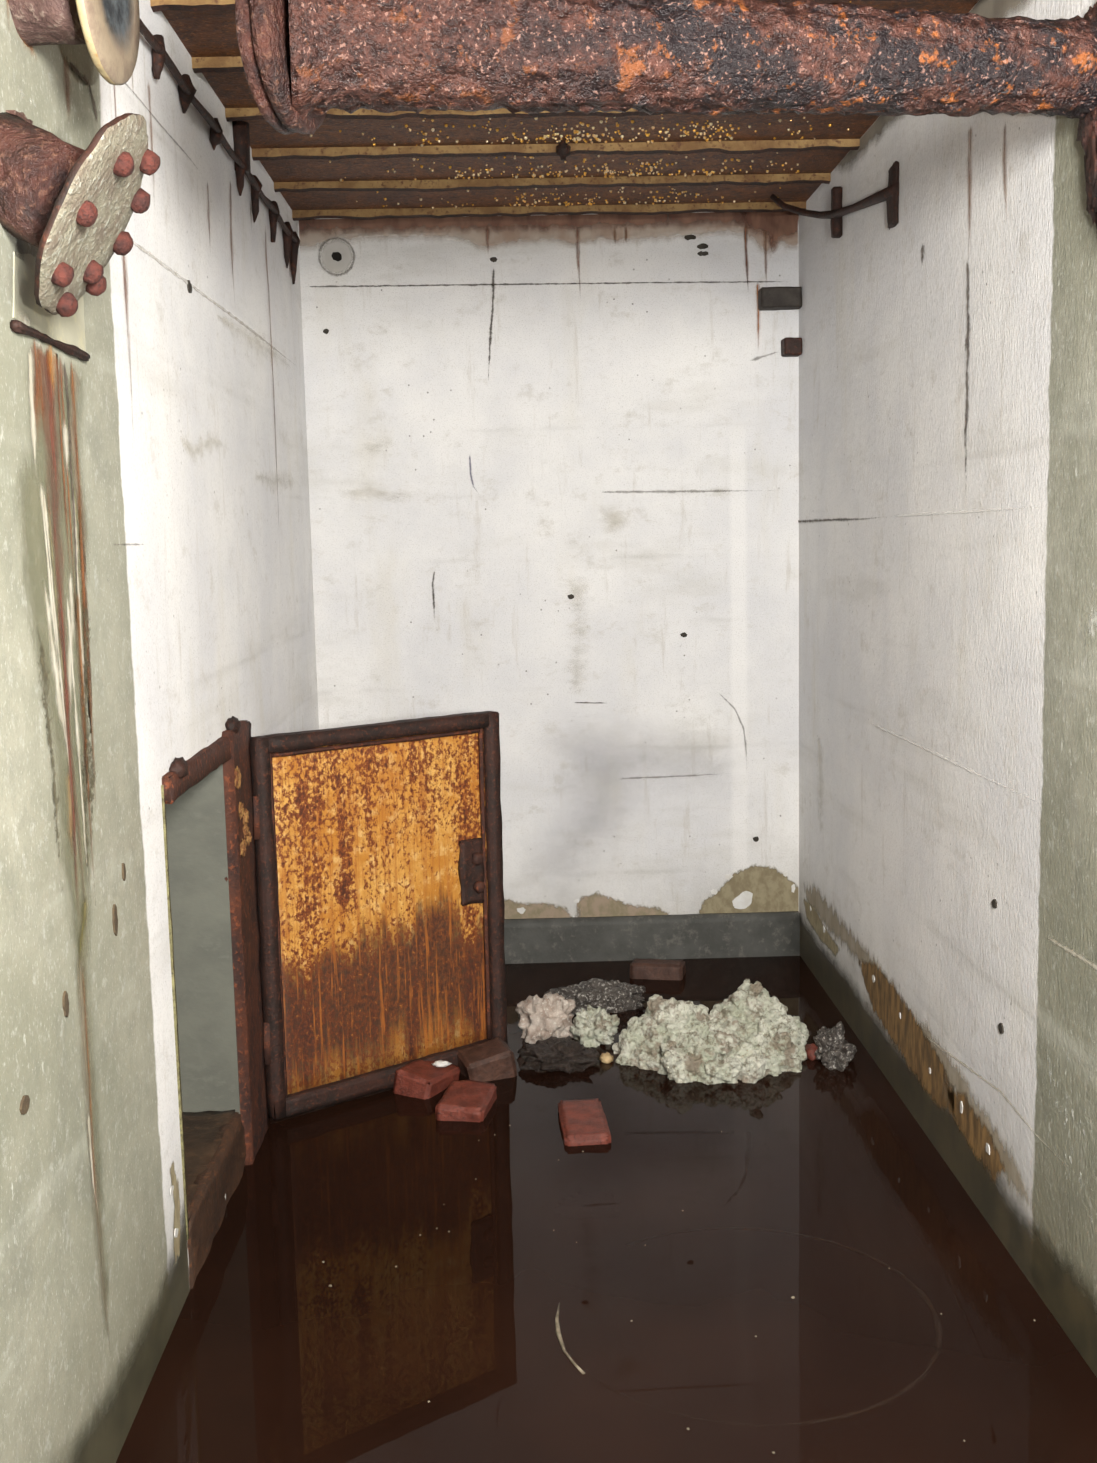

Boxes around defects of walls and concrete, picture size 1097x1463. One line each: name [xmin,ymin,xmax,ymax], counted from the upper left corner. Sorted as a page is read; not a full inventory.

rust [23,342,99,1206]
peeling [504,893,668,919]
peeling [699,865,839,956]
peeling [859,960,1005,1181]